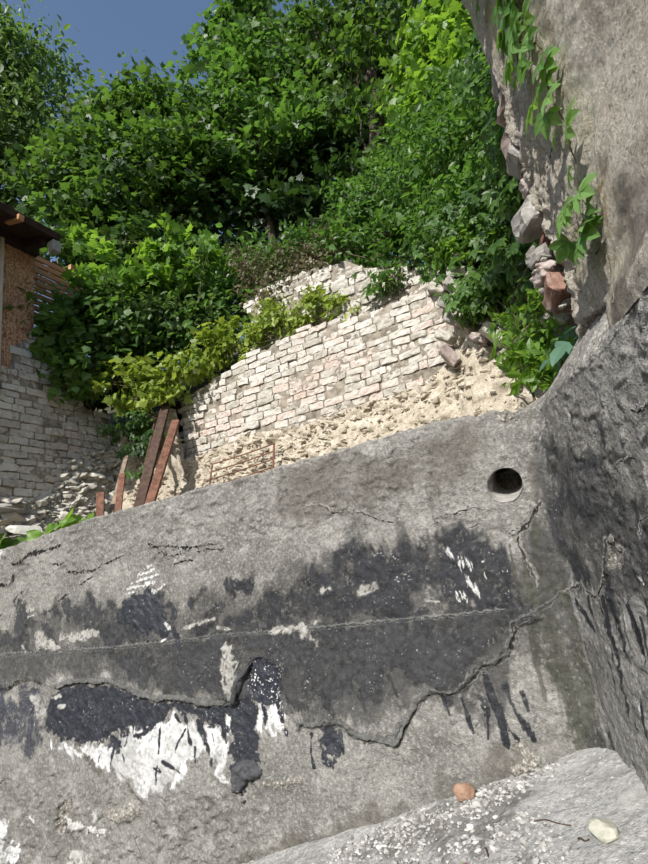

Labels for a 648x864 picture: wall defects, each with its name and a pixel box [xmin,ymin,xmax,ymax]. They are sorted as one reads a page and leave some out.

peeling [126,565,165,595]
leakage [224,577,253,599]
peeling [357,582,378,596]
peeling [35,629,99,650]
peeling [270,620,318,647]
crack [0,498,610,747]
leakage [496,544,648,750]
peeling [50,642,252,837]
leakage [74,713,229,785]
peeling [256,703,286,738]
leakage [260,698,288,736]
leakage [461,681,537,743]